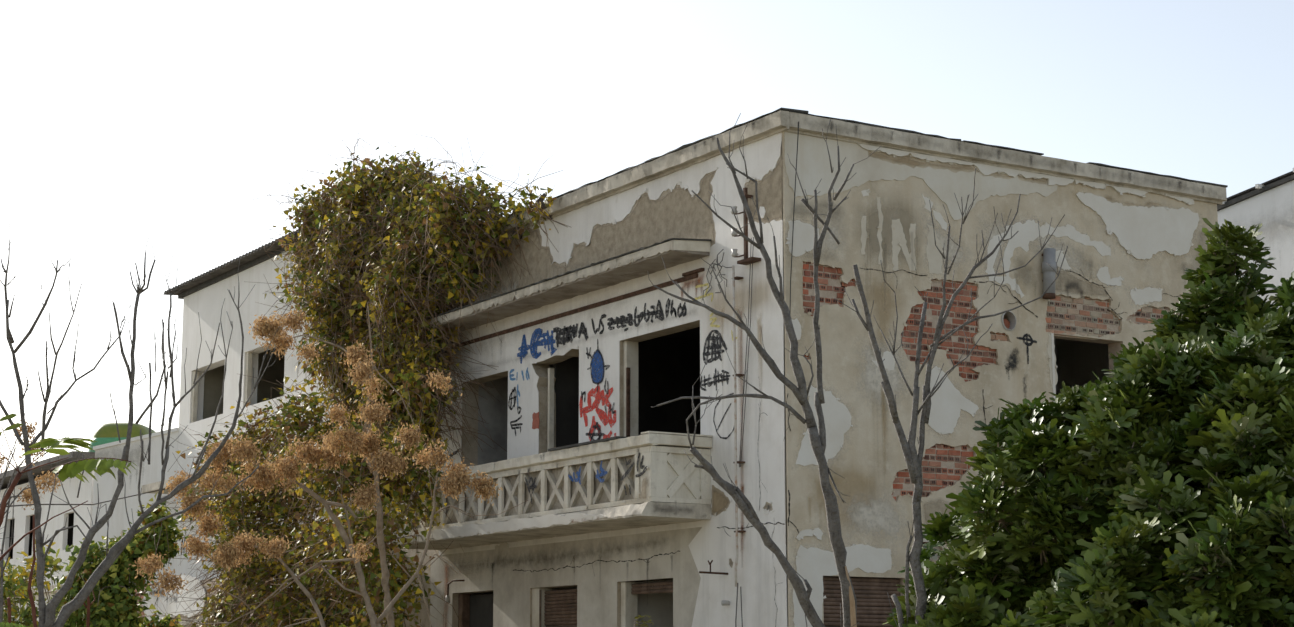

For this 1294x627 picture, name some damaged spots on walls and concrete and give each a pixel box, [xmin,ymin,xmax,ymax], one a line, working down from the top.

flaking render [446,167,718,311]
flaking render [742,159,857,360]
flaking render [793,184,1199,627]